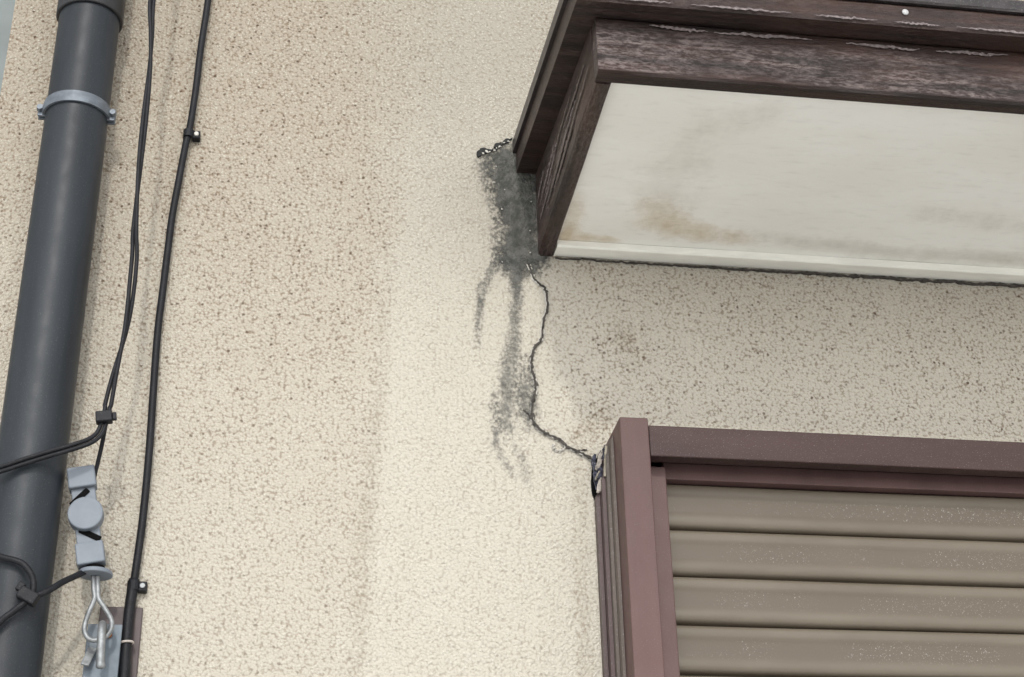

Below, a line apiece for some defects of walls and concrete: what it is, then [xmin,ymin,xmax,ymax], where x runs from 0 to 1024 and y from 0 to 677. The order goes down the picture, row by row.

water stain [476,144,551,444]
crack [523,262,592,463]